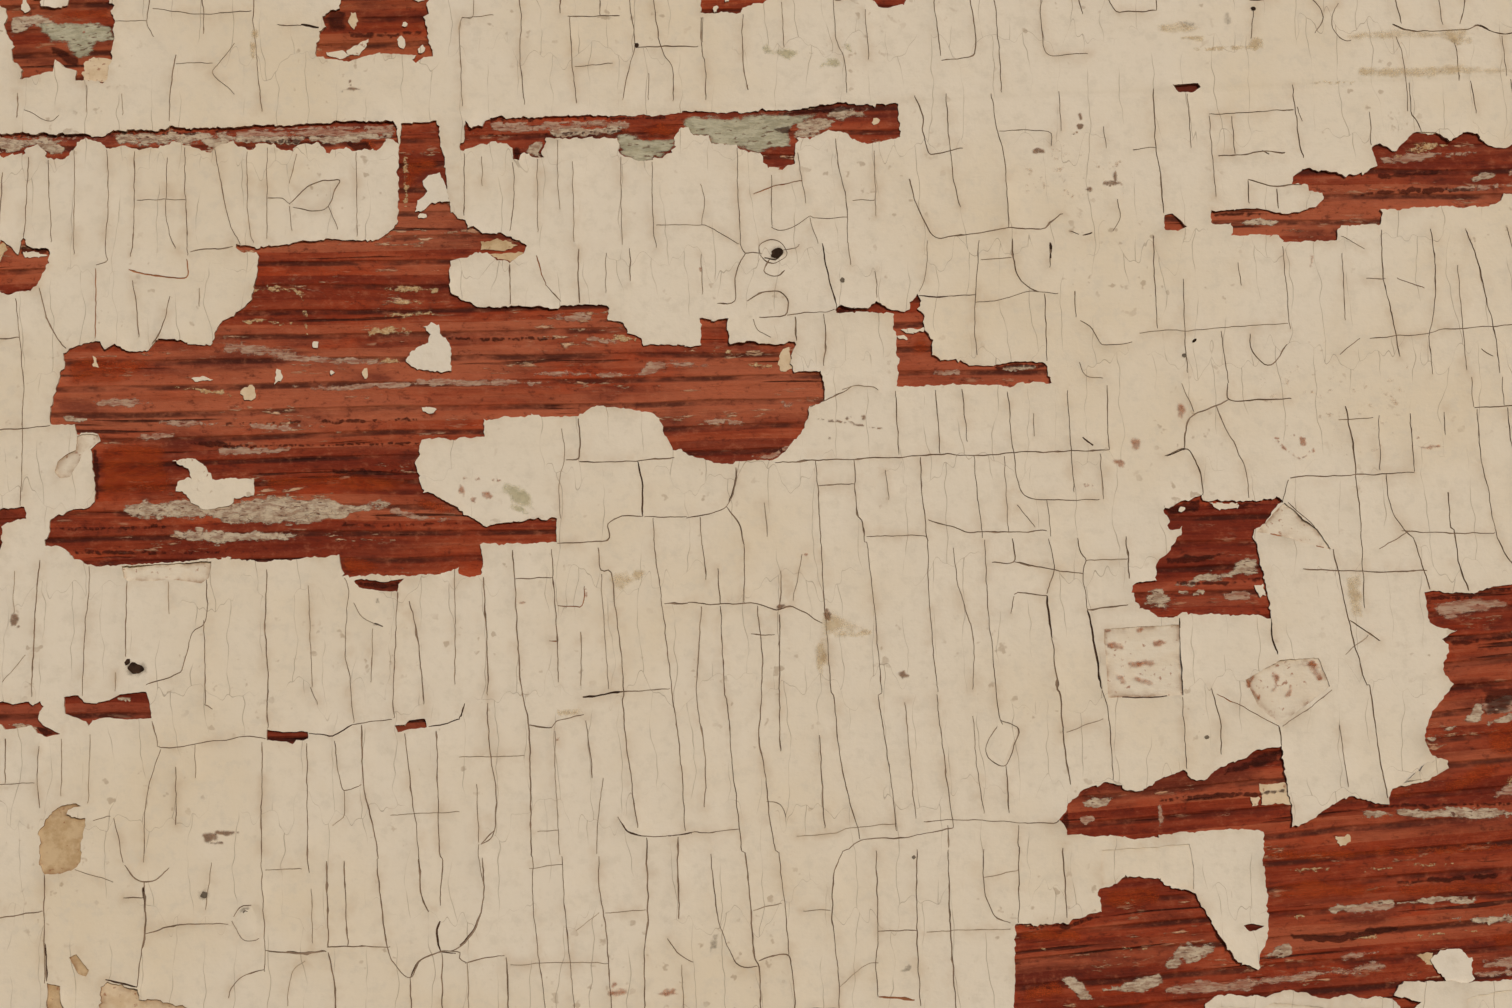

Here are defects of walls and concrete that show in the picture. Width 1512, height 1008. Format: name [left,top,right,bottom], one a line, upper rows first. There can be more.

peeling [316,0,433,63]
crack [559,0,706,103]
crack [0,148,358,506]
peeling [0,103,901,592]
crack [463,141,657,304]
crack [693,139,877,366]
peeling [836,295,1051,387]
crack [909,0,1304,498]
peeling [1211,132,1512,242]
peeling [1104,495,1330,698]
crack [1270,229,1512,798]
peeling [1014,584,1512,1008]